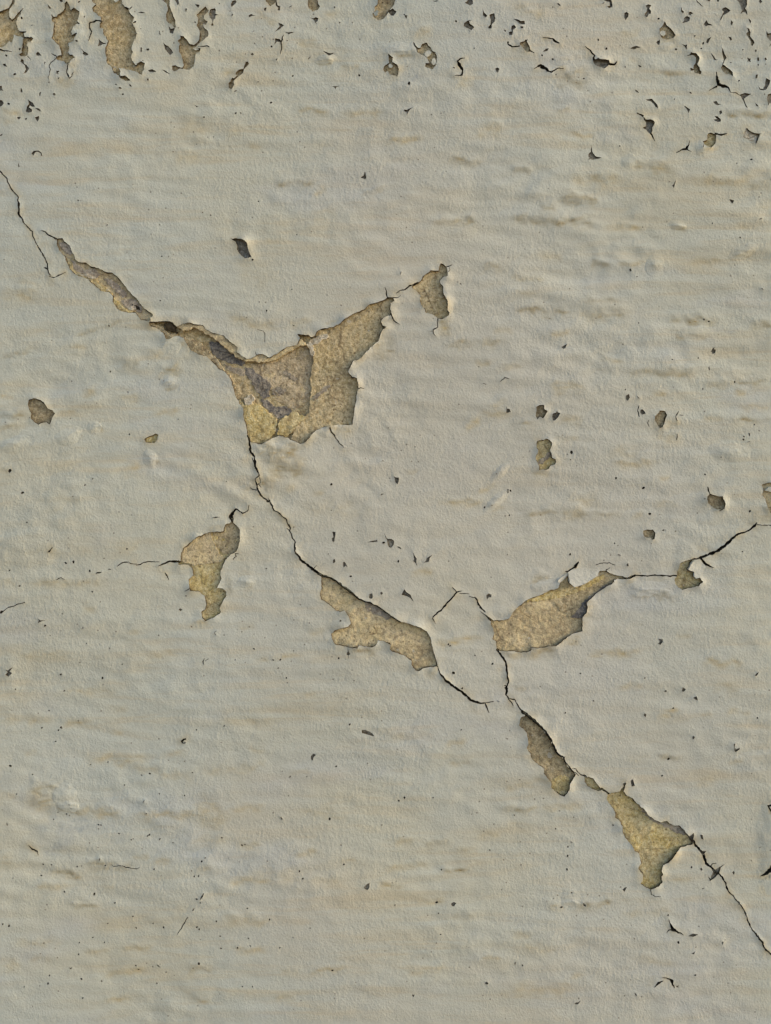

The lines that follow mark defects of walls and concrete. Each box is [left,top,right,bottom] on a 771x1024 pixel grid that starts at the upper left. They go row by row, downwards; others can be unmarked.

peeling [92,0,218,89]
crack [0,171,66,278]
peeling [56,238,394,444]
peeling [176,518,240,621]
crack [213,436,400,622]
peeling [319,573,438,671]
crack [432,587,491,624]
peeling [488,554,632,653]
crack [565,522,771,579]
crack [438,648,610,794]
peeling [519,712,706,890]
crack [693,840,771,955]